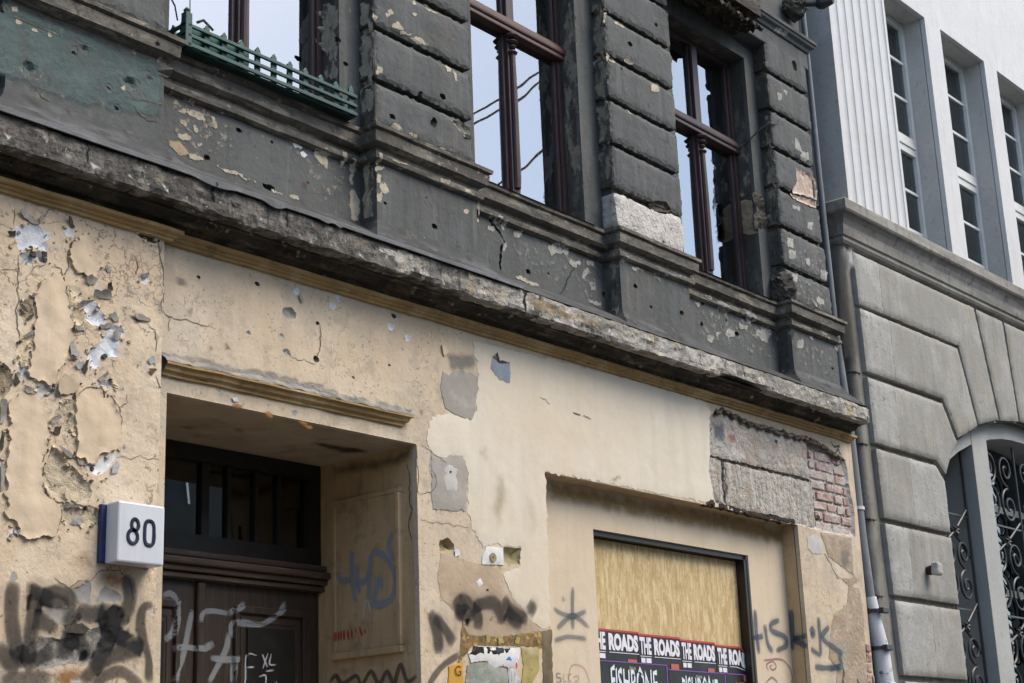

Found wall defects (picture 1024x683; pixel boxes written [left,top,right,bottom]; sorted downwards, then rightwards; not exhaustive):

peeling [169,101,232,160]
peeling [291,143,408,221]
spalling [739,120,817,235]
crack [130,241,216,349]
crack [489,220,505,270]
peeling [464,189,684,314]
spalling [0,266,125,528]
spalling [440,344,479,420]
peeling [490,352,511,383]
spalling [431,453,468,512]
spalling [709,407,875,683]
spalling [438,538,553,683]